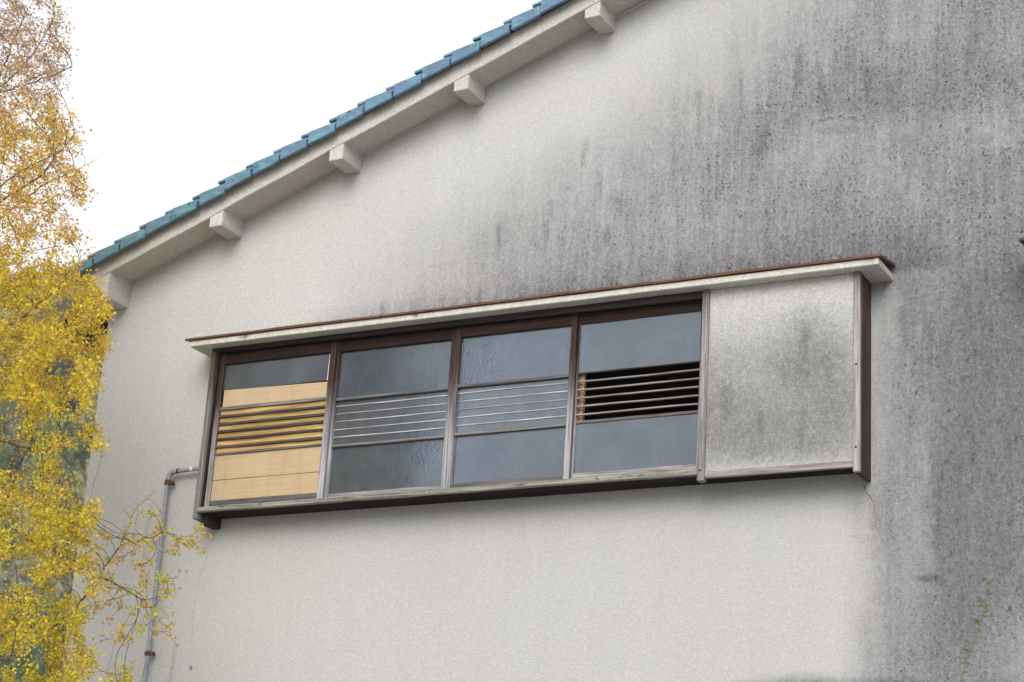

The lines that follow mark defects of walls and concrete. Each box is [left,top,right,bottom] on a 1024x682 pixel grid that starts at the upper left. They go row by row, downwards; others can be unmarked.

water stain [468,0,1024,682]